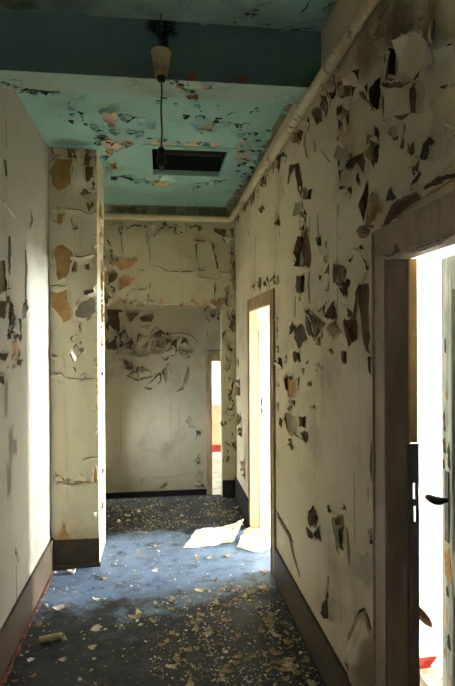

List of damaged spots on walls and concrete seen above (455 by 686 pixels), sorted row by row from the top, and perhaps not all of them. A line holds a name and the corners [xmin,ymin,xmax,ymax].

peeling [1,78,60,96]
peeling [49,27,455,487]
peeling [0,256,29,386]
crack [276,511,300,575]
peeling [306,502,322,543]
peeling [327,502,350,563]